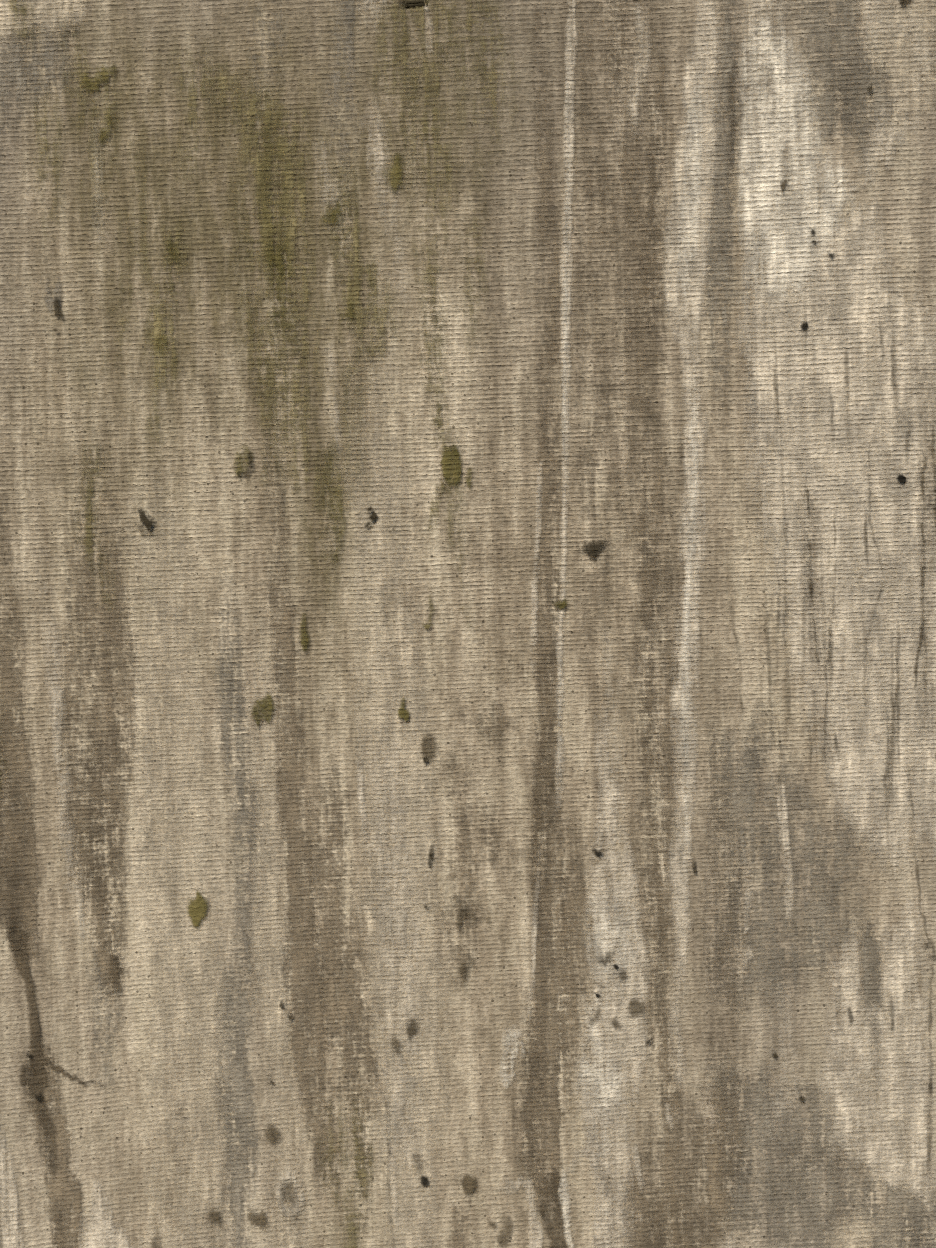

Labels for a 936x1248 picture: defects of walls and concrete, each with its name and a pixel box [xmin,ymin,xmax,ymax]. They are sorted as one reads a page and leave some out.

leakage [0,577,131,1248]
leakage [50,413,513,1248]
leakage [502,0,936,1248]